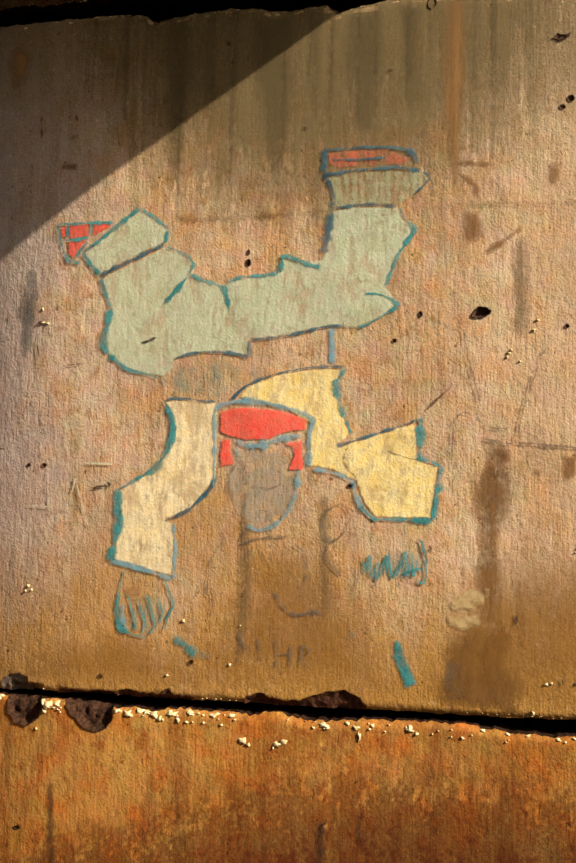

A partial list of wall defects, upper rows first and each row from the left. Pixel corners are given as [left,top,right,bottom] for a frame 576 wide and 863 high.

damp [94,0,550,191]
crack [444,329,576,456]
damp [41,688,62,713]
damp [114,708,236,726]